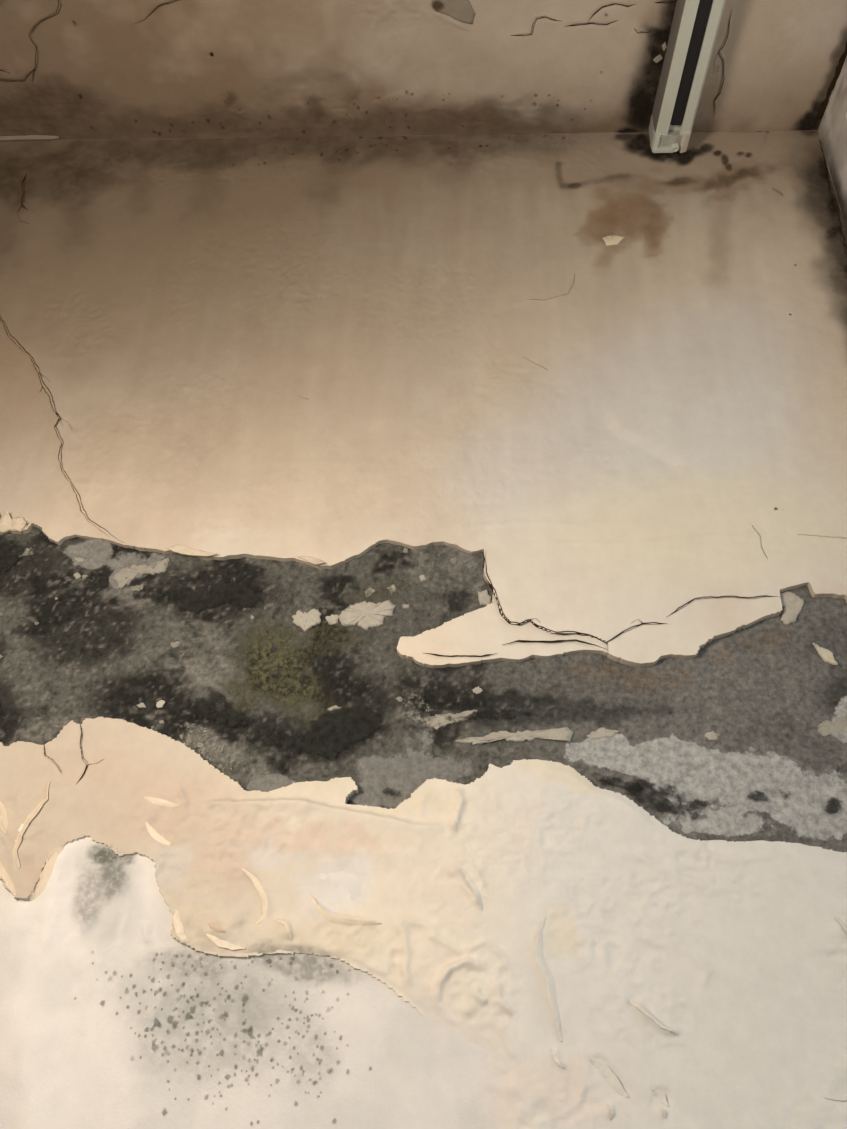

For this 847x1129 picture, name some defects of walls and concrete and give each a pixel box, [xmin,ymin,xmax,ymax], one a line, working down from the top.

crack [0,0,61,82]
peeling [432,0,476,28]
crack [510,1,666,36]
mould [617,0,677,158]
mould [808,167,847,294]
crack [0,319,124,545]
crack [426,557,779,657]
crack [44,721,104,783]
water stain [93,849,117,864]
spalling [0,510,847,1129]